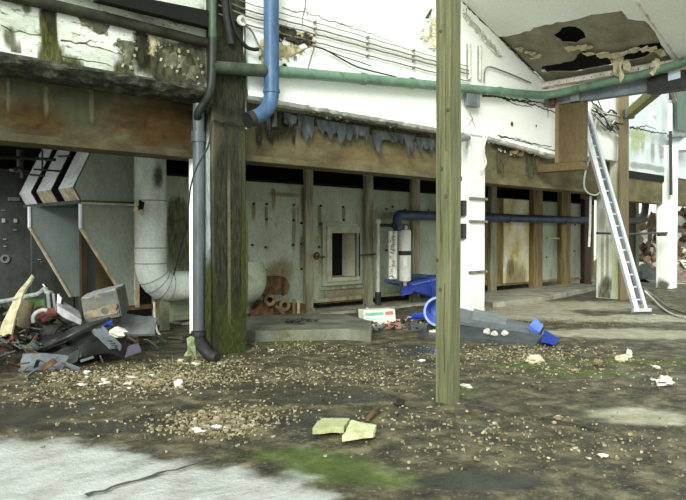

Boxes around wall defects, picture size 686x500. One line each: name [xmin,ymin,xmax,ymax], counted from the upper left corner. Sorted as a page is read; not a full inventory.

water stain [38,9,83,66]
crack [61,39,123,67]
peeling [113,38,138,70]
peeling [146,34,205,85]
spalling [279,24,315,66]
spalling [419,7,436,51]
crack [482,94,555,113]
peeling [283,110,436,156]